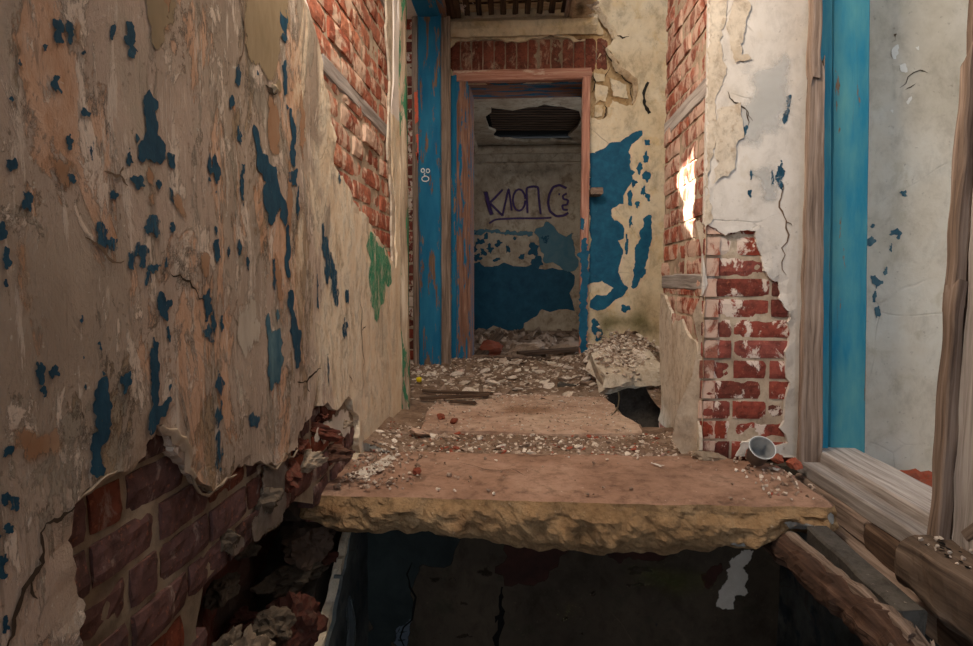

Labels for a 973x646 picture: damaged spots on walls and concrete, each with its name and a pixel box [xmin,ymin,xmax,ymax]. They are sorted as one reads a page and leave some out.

peeling [43,18,74,51]
peeling [110,21,138,59]
peeling [126,89,186,286]
peeling [201,226,250,343]
peeling [229,0,306,392]
flaking render [306,0,395,322]
flaking render [474,0,792,461]
crack [728,92,753,125]
crack [778,184,792,273]
flaking render [68,291,864,646]
crack [7,507,75,646]
crack [492,587,505,646]